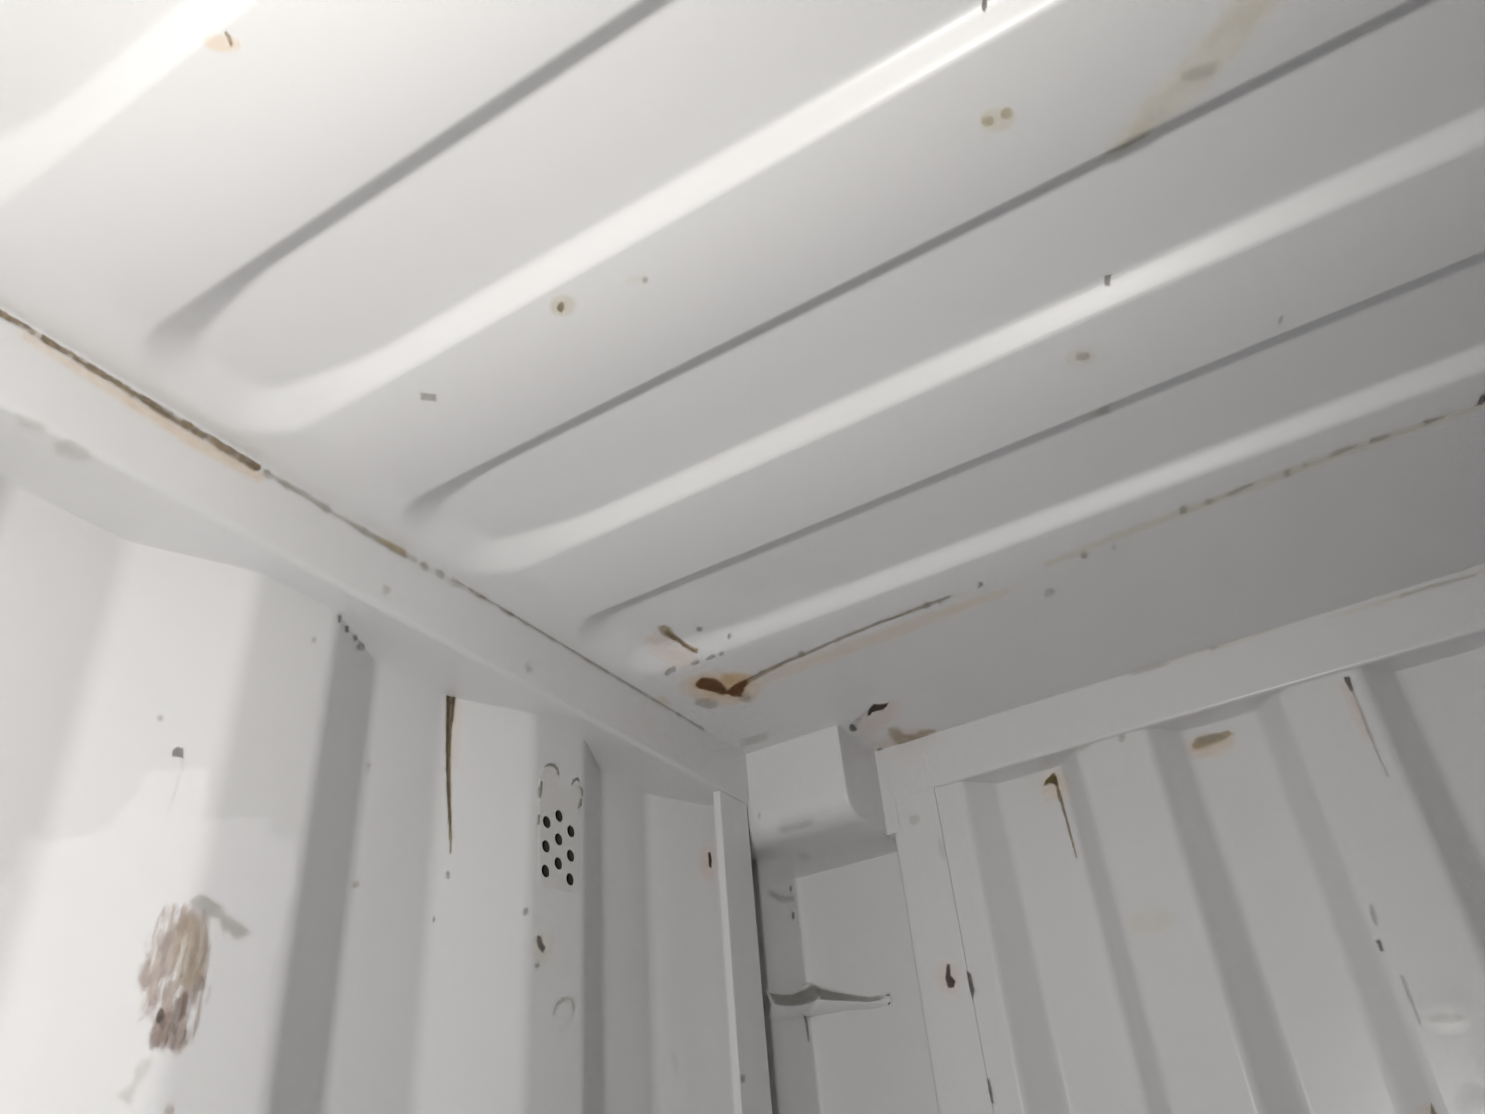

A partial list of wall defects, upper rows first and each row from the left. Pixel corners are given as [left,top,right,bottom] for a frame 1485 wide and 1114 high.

rust [658,598,947,697]
rust [891,731,932,744]
rust [1192,731,1231,748]
rust [1044,773,1076,854]